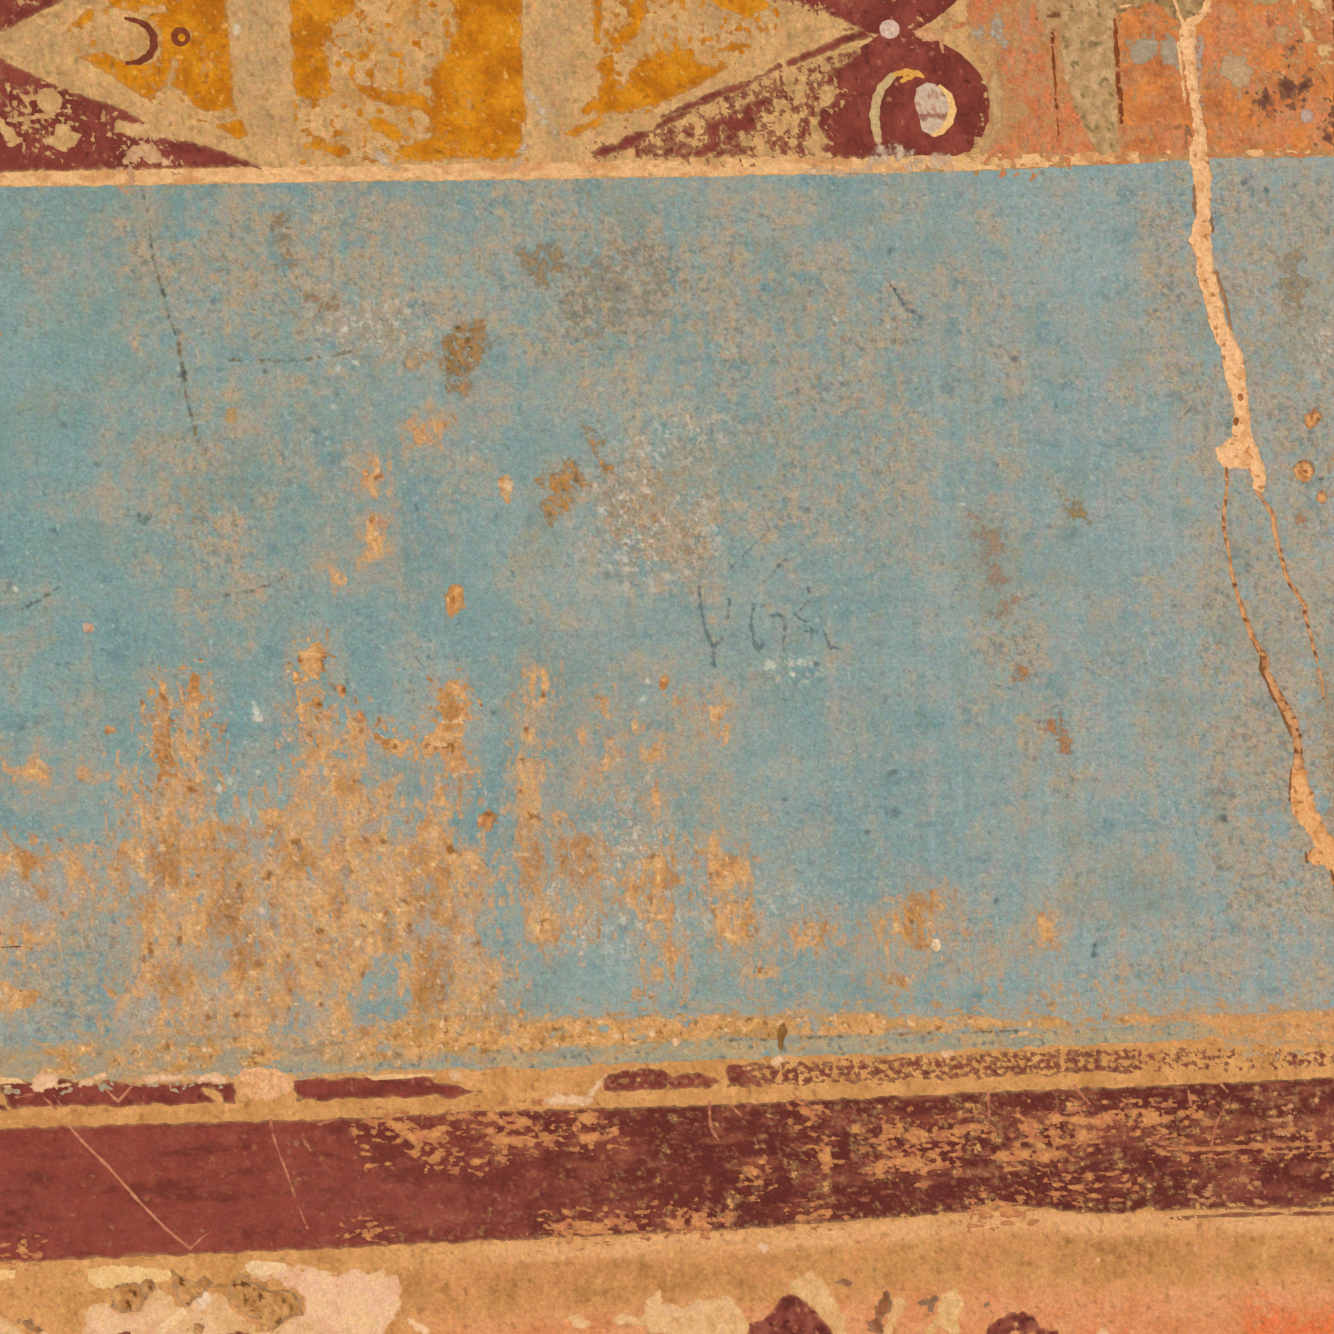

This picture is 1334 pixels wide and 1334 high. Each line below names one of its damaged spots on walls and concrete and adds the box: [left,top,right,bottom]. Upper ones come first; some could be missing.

peeling [897,14,951,53]
peeling [0,75,189,195]
peeling [792,76,848,171]
peeling [964,55,1017,166]
crack [1173,0,1334,887]
spalling [1303,409,1323,430]
spalling [1292,459,1330,504]
peeling [0,626,1334,1107]
flaking render [81,1260,430,1334]
flaking render [613,1290,749,1334]
flaking render [789,1271,853,1334]
flaking render [867,1287,965,1334]